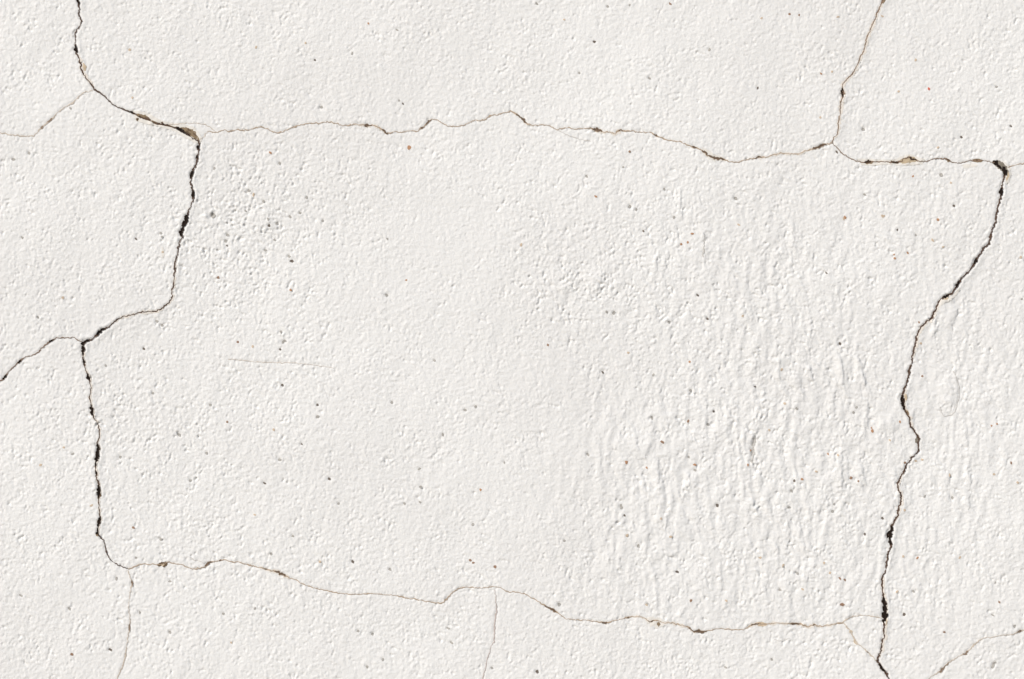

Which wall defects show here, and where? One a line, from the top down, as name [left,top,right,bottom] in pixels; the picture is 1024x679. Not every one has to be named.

crack [0,0,988,277]
crack [0,281,373,679]
crack [379,175,1006,679]
crack [929,629,1024,679]